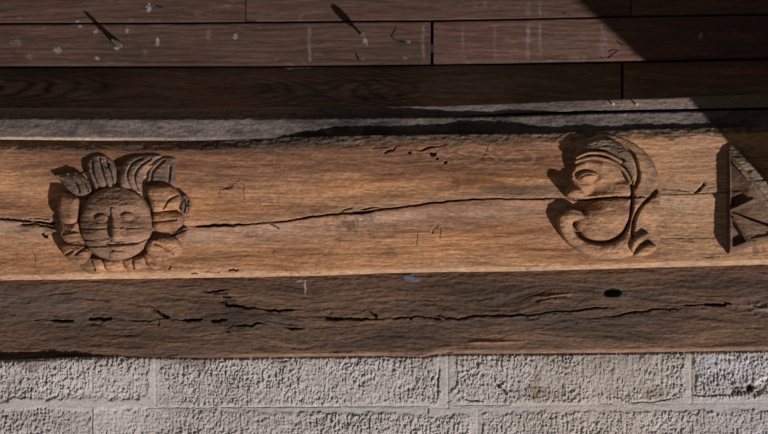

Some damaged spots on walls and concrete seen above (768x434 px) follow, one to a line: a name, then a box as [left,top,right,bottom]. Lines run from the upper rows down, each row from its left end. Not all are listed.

crack [0,187,727,254]
crack [13,269,755,332]